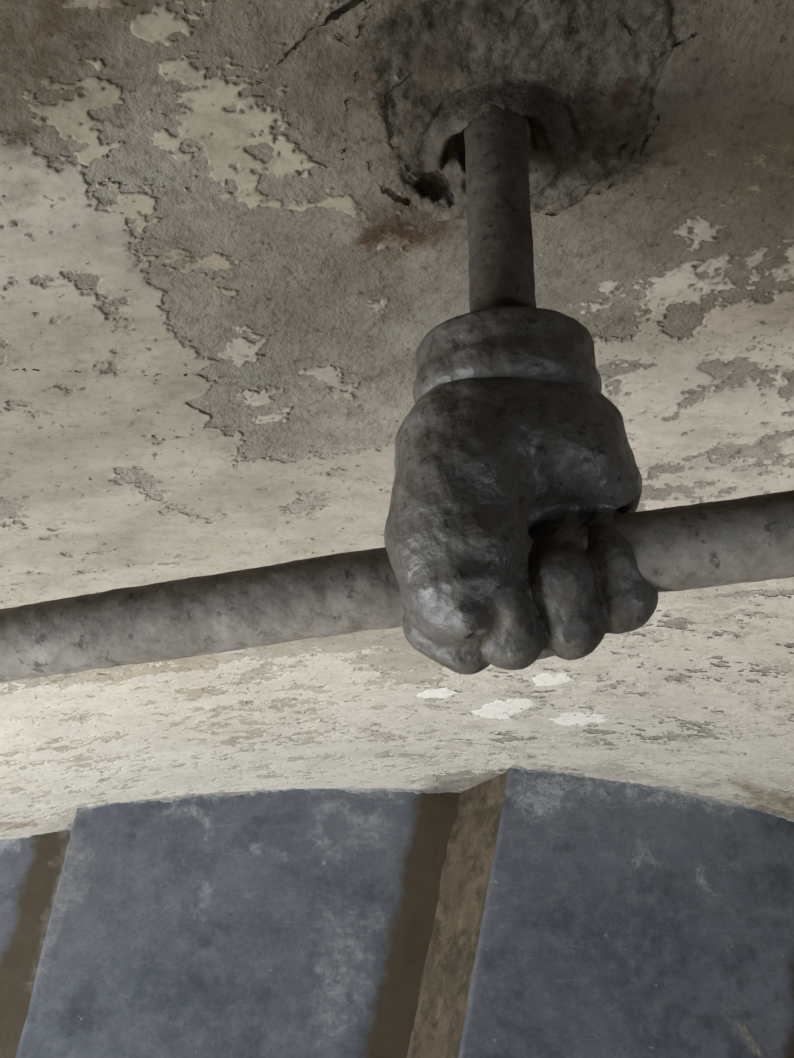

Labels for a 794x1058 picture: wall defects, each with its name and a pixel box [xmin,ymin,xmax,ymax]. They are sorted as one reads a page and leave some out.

peeling [62,0,416,255]
crack [238,0,371,112]
crack [341,73,453,208]
crack [536,114,720,218]
peeling [0,55,395,609]
peeling [569,183,794,511]